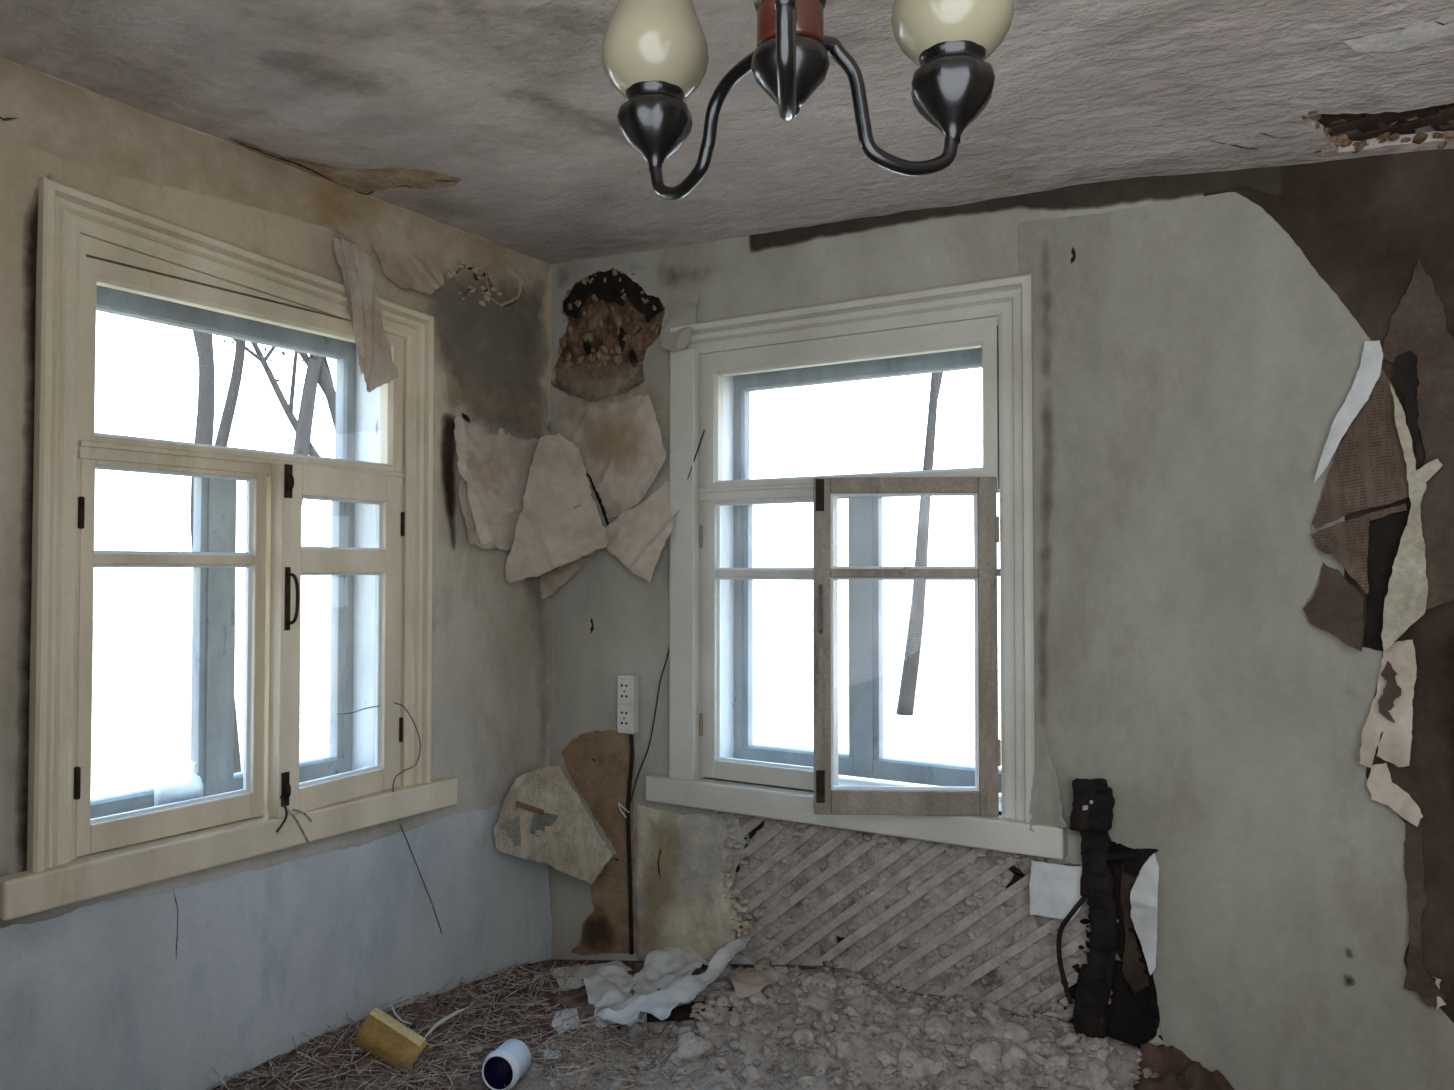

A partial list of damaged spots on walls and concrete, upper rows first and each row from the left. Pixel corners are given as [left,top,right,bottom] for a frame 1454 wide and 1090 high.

flaking render [1302,103,1454,154]
flaking render [551,268,665,402]
flaking render [712,810,1091,1021]